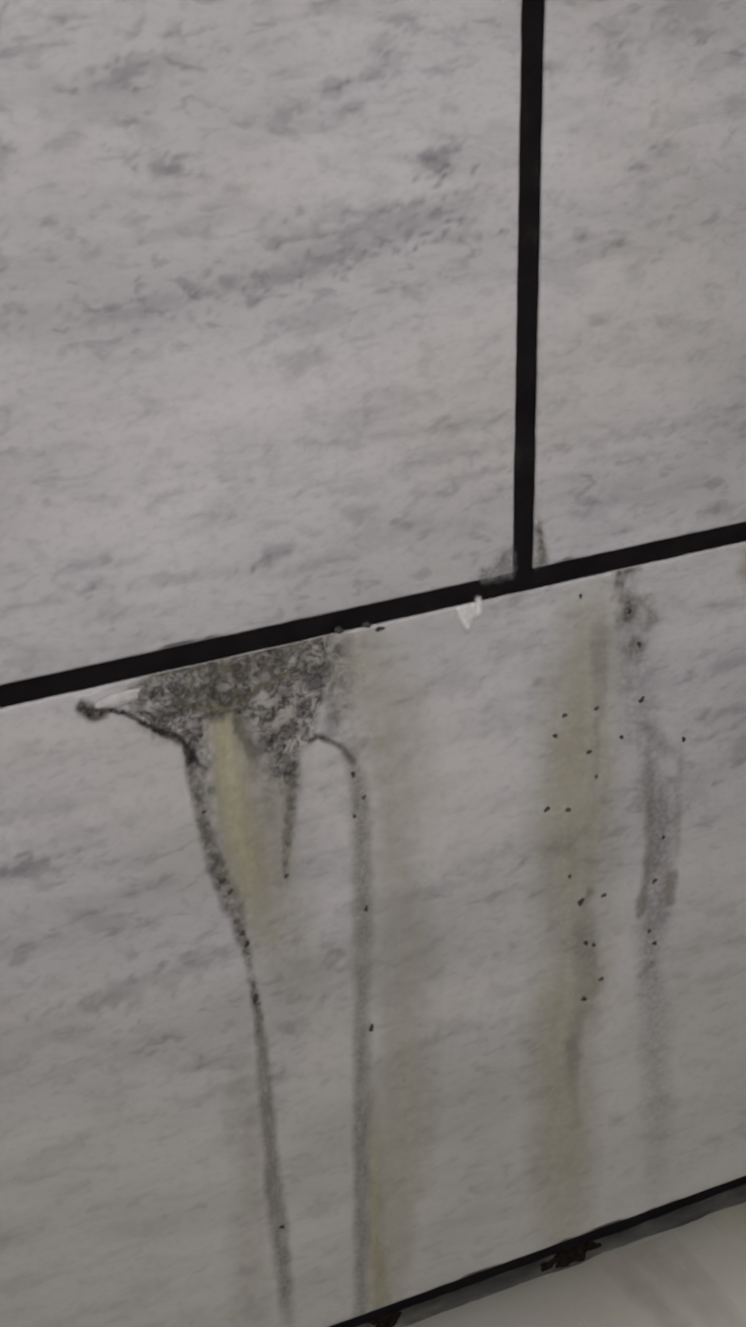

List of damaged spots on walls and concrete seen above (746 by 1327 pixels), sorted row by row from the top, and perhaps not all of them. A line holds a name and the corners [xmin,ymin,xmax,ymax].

leakage [77,626,345,961]
leakage [252,984,289,1292]
leakage [351,764,402,1327]